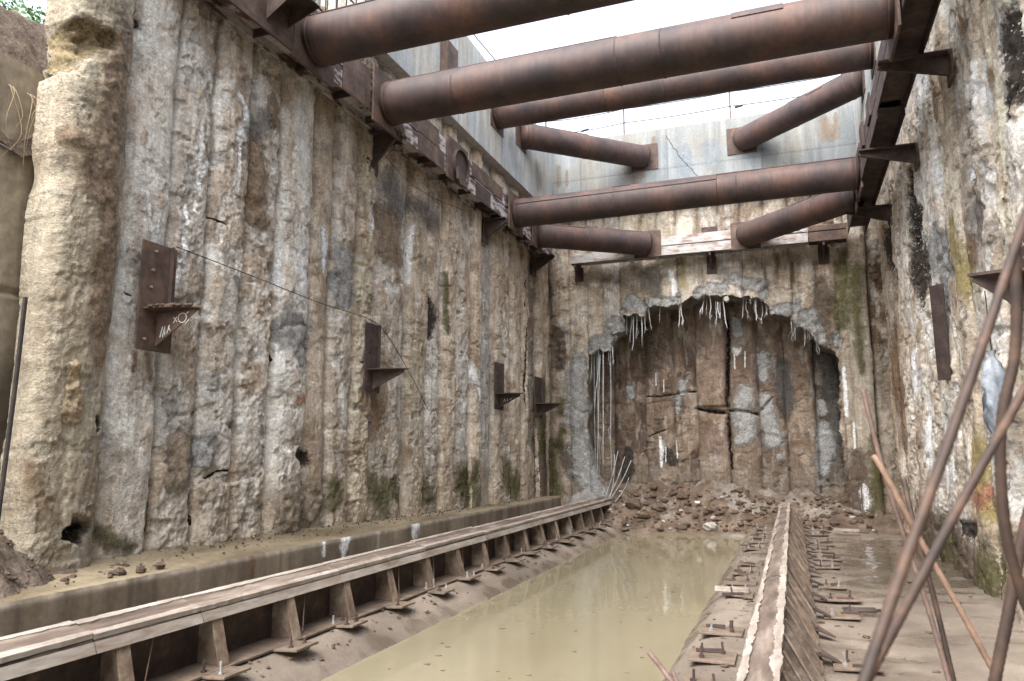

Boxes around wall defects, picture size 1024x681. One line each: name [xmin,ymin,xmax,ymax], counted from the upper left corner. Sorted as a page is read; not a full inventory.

leakage [955,0,1024,123]
spalling [552,273,843,505]
crack [647,320,773,470]
crack [187,470,228,526]